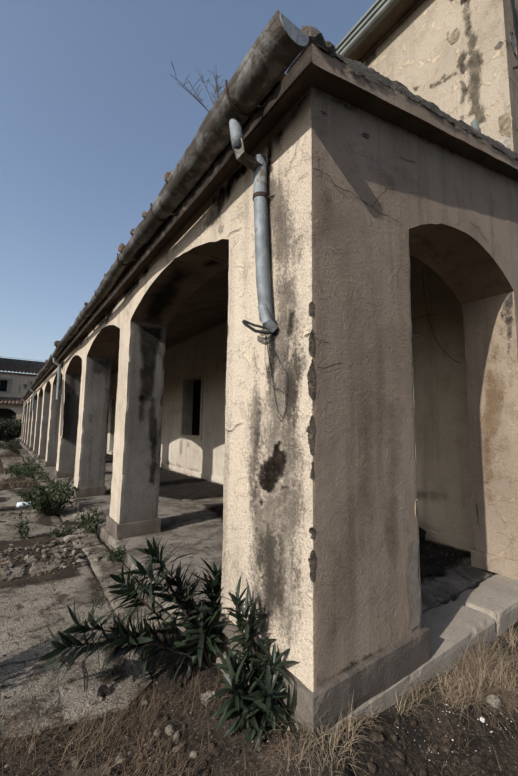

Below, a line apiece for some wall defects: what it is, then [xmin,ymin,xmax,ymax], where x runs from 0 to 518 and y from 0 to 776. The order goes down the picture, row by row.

water stain [345,0,518,159]
spalling [446,27,460,45]
water stain [205,164,246,235]
water stain [267,129,302,267]
crack [288,139,404,226]
water stain [138,327,161,483]
water stain [248,271,306,644]
spalling [306,330,316,399]
spalling [306,416,316,480]